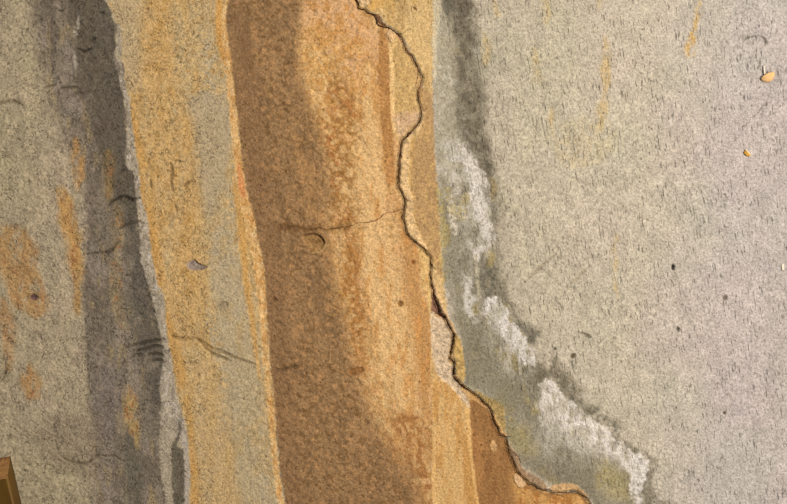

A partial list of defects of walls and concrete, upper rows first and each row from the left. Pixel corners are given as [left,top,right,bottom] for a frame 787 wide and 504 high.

leakage [24,0,192,504]
corrosion [302,0,488,504]
crack [287,0,590,504]
corrosion [487,176,500,204]
leakage [430,0,673,504]